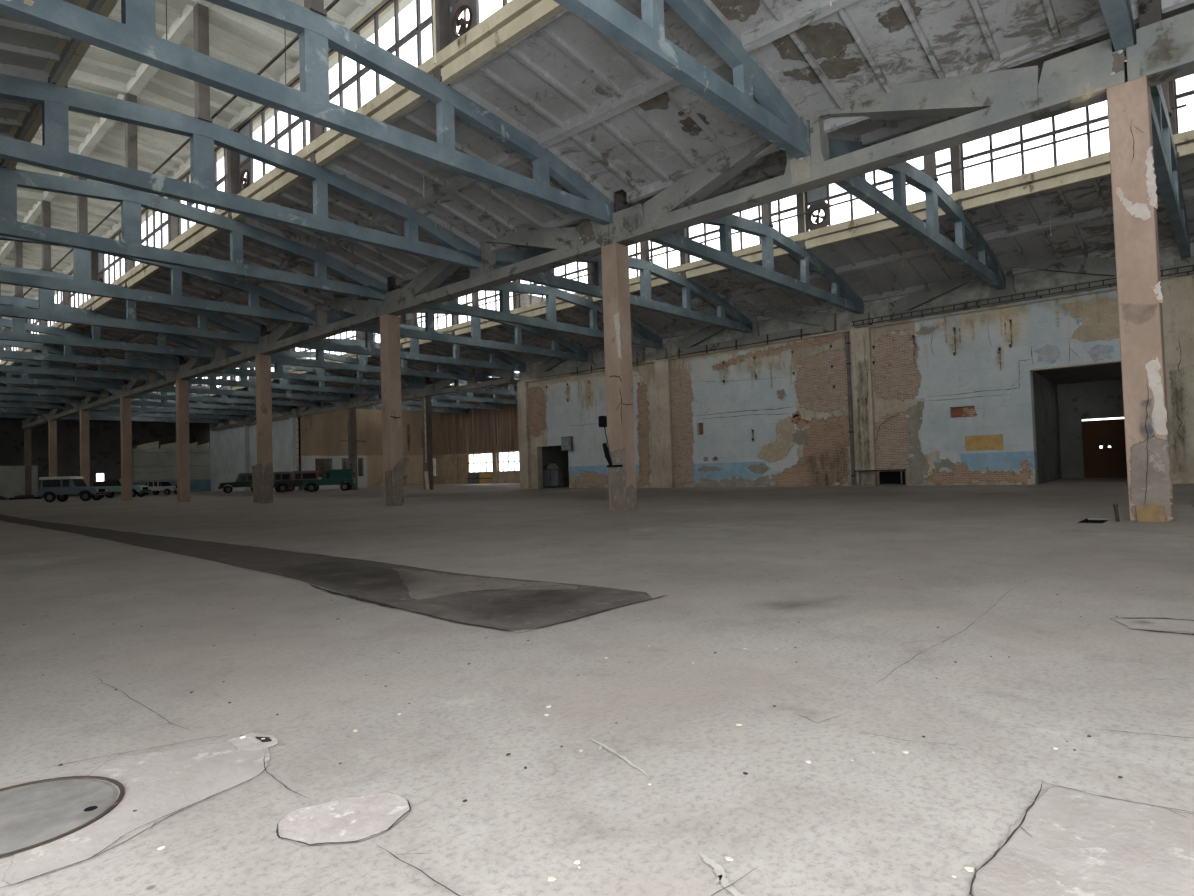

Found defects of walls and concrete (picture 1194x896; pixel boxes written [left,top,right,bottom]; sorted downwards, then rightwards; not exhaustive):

peeling [711,0,760,22]
peeling [771,22,863,85]
peeling [875,0,922,33]
peeling [1114,146,1159,220]
flaking render [671,333,850,487]
crack [969,781,1190,896]